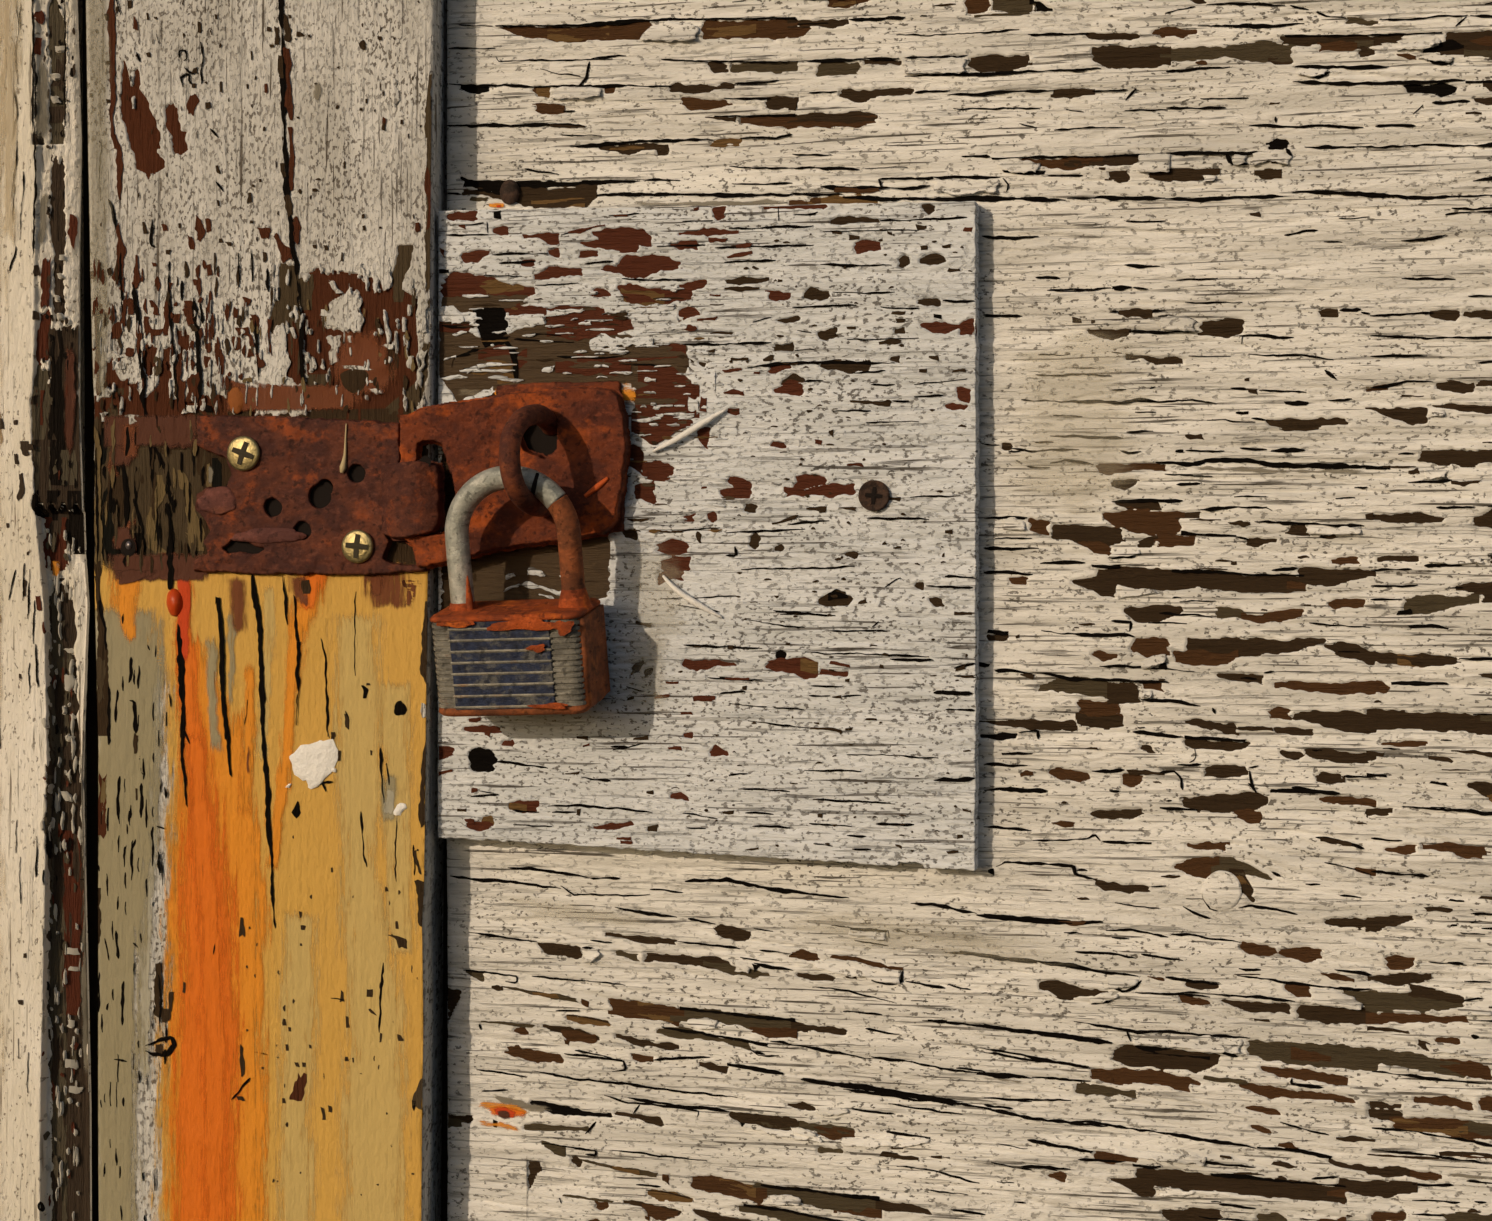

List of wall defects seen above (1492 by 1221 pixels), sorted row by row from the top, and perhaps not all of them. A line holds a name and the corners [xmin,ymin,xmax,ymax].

peeling [933,0,1053,18]
peeling [879,298,977,427]
peeling [1072,308,1245,365]
rust [621,384,636,401]
rust [104,413,198,474]
peeling [1262,417,1348,431]
rust [197,486,237,515]
rust [584,477,609,498]
peeling [0,0,942,1221]
peeling [1077,841,1272,902]
peeling [1324,907,1453,932]
crack [103,1144,156,1221]